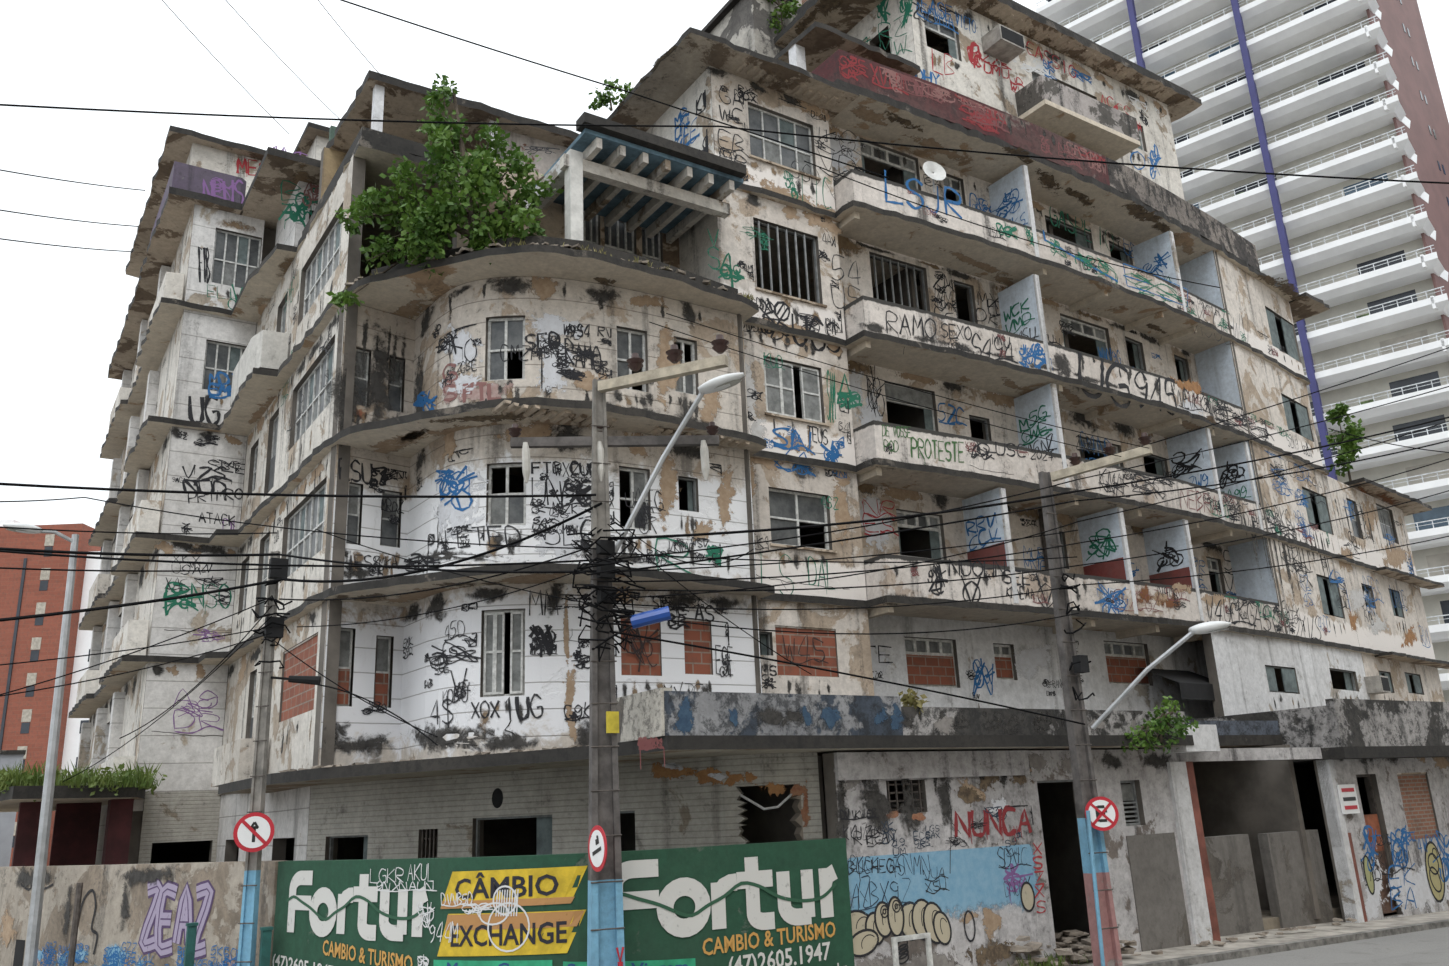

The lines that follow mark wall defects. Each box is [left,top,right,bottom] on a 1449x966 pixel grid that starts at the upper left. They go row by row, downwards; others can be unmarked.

spalling [789,0,842,39]
water stain [917,0,990,31]
spalling [964,0,1062,54]
water stain [1025,38,1167,119]
water stain [750,81,847,138]
spalling [829,104,965,173]
water stain [673,680,712,735]
water stain [756,680,842,730]
water stain [874,702,1064,735]
peeling [650,762,811,844]
water stain [4,866,72,950]
water stain [121,866,173,931]